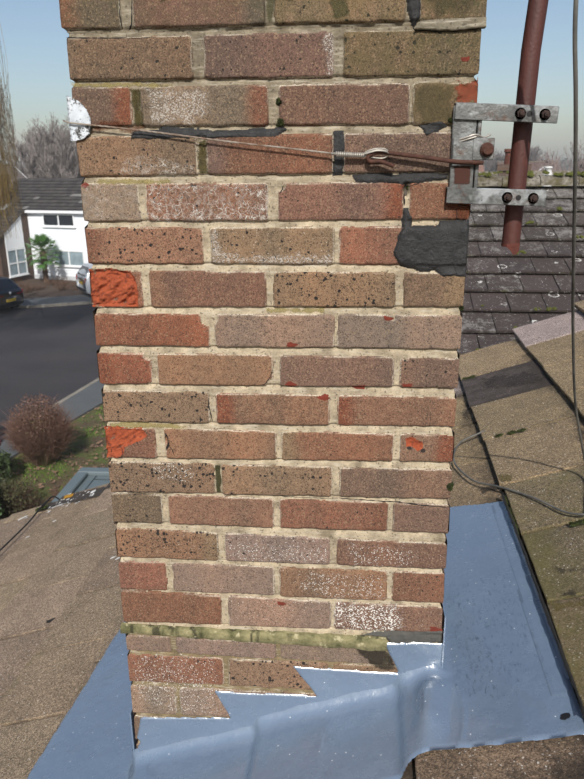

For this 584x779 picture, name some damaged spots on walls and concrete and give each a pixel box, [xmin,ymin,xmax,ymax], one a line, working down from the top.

leakage [330,0,349,18]
spalling [89,268,139,307]
spalling [104,426,147,458]